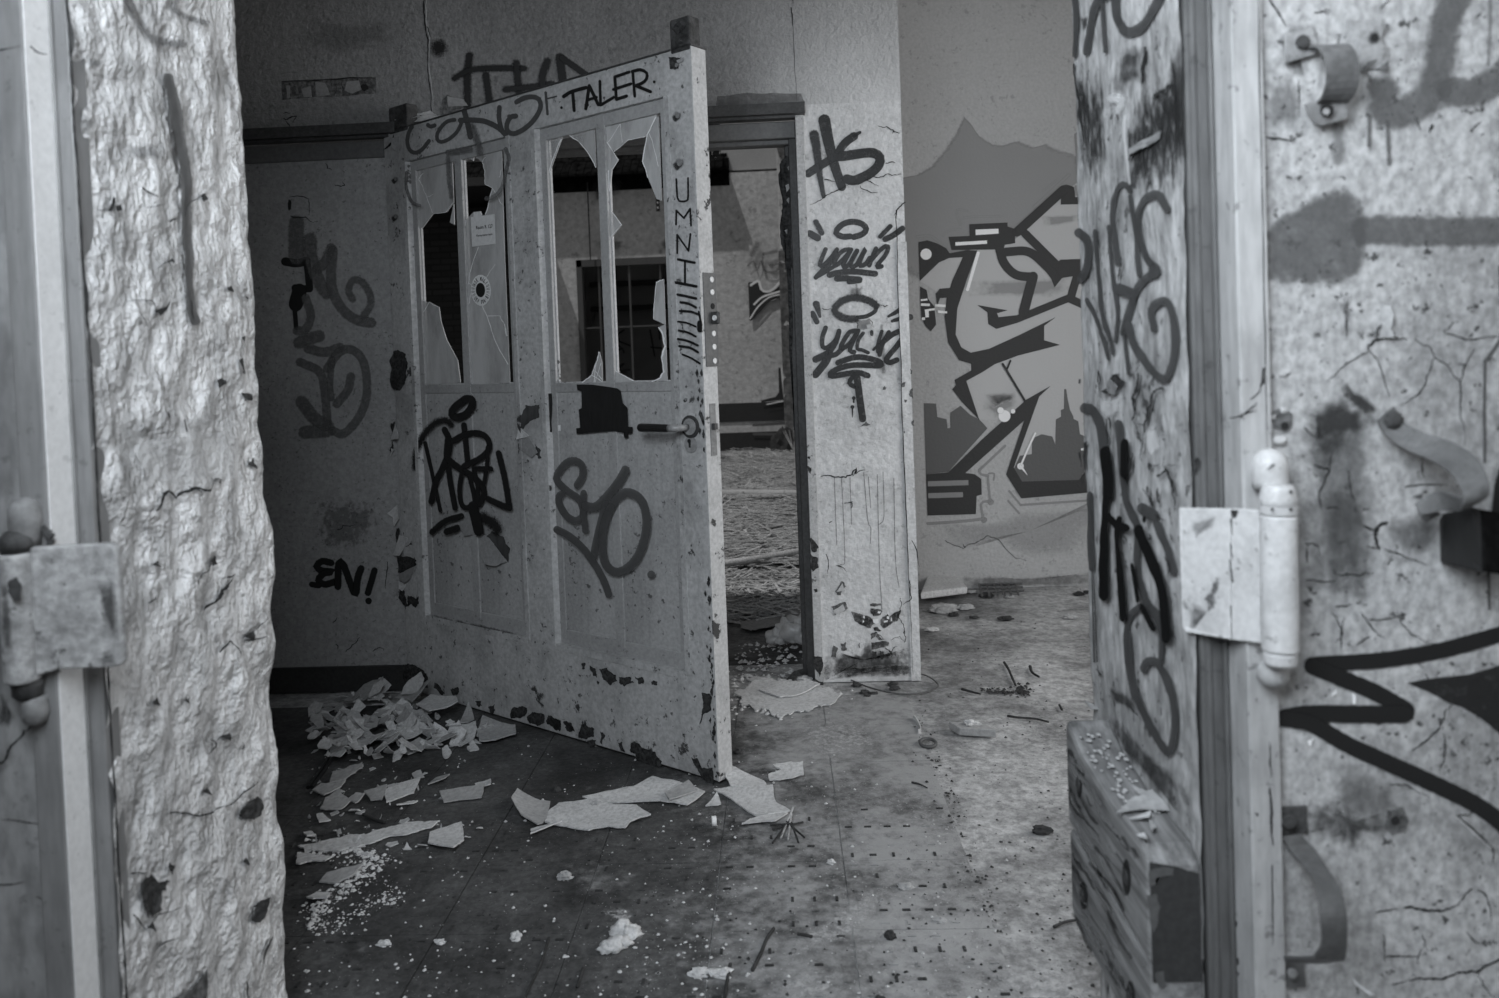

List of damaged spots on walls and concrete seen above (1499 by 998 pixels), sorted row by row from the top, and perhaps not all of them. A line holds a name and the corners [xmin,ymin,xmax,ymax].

spalling [142,187,208,222]
crack [1330,308,1499,446]
peeling [403,663,459,696]
peeling [581,663,657,687]
peeling [699,693,711,724]
crack [0,726,33,764]
peeling [475,701,662,768]
peeling [692,758,714,784]
spalling [239,796,264,820]
spalling [131,862,180,932]
spalling [245,897,271,945]
spalling [175,969,208,998]